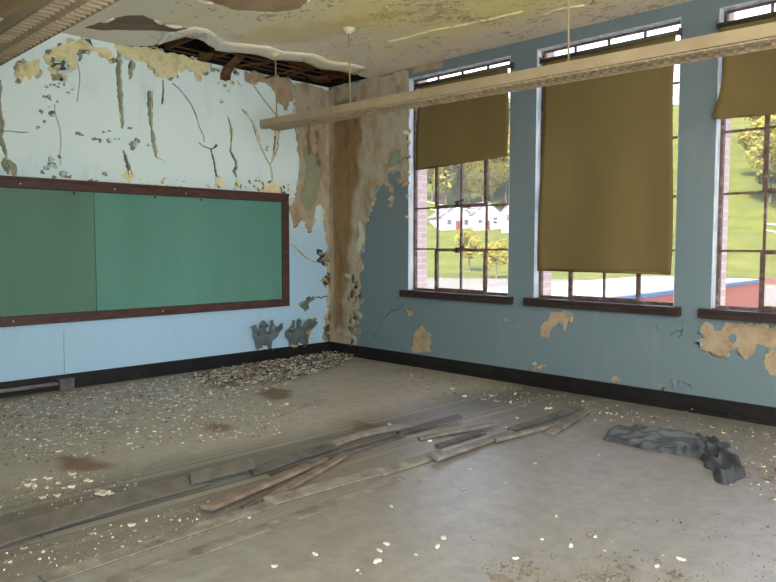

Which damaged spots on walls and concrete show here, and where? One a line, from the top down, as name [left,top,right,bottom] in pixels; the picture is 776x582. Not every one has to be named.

peeling [171,0,342,22]
crack [74,61,82,101]
crack [116,51,135,129]
flaking render [13,15,443,130]
crack [0,80,28,176]
peeling [40,155,72,179]
crack [54,104,62,165]
crack [121,150,135,183]
crack [147,80,301,194]
flaking render [206,109,411,351]
flaking render [410,325,432,354]
flaking render [539,310,574,339]